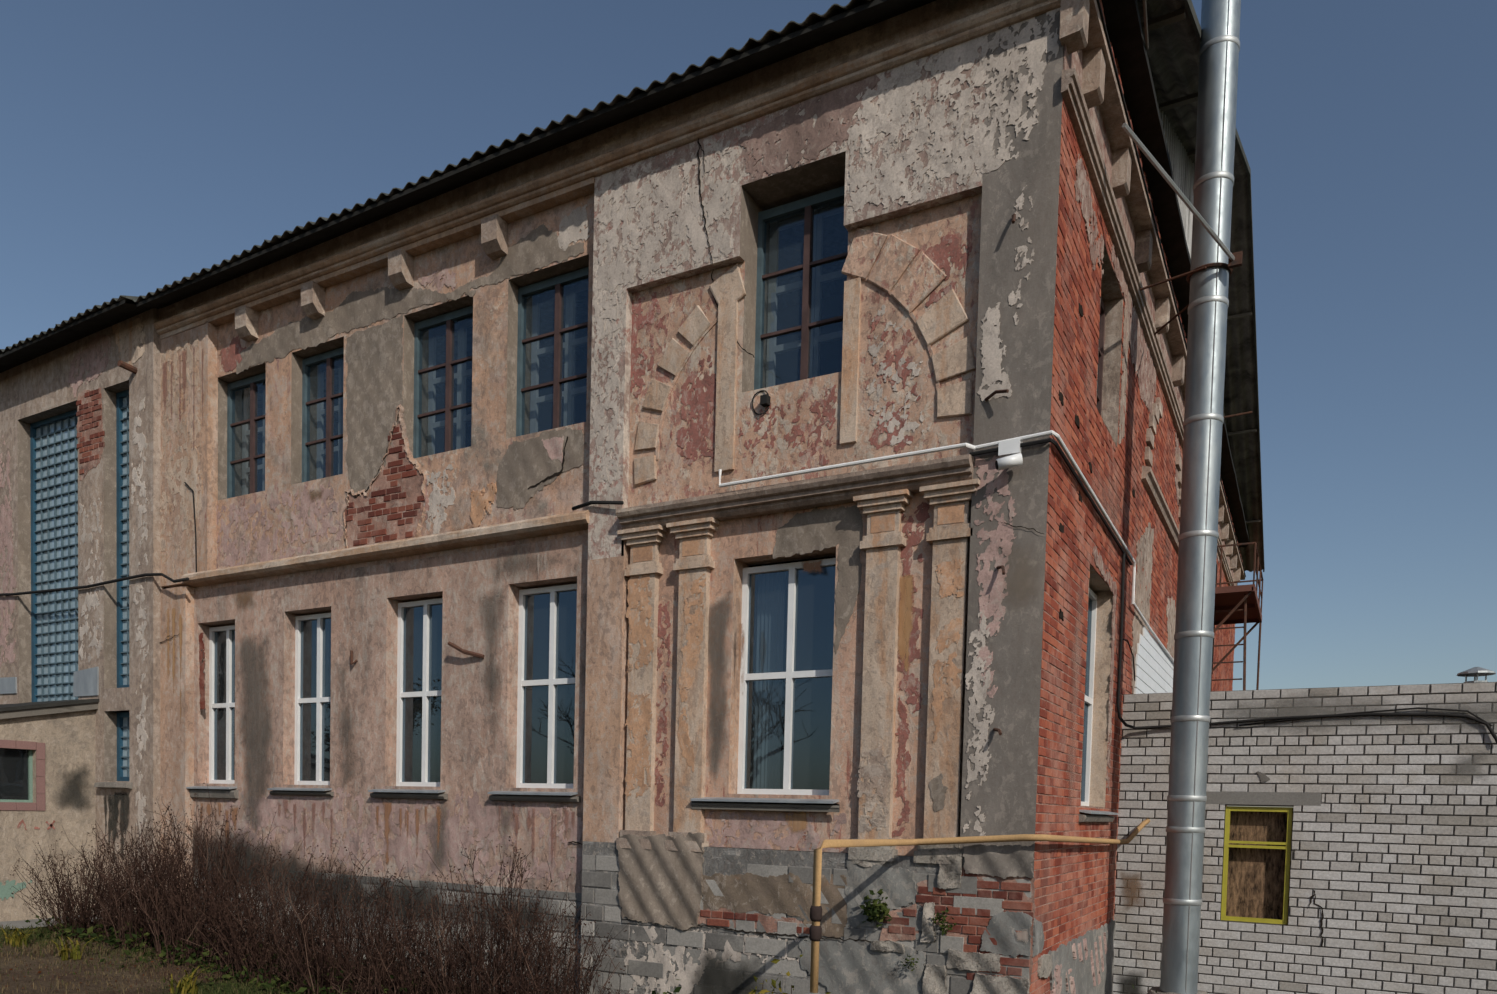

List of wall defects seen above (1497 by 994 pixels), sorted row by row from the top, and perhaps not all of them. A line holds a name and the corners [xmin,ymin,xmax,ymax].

peeling [68,317,203,833]
peeling [220,335,247,372]
flaking render [342,404,497,548]
peeling [557,7,1061,496]
flaking render [624,455,1116,994]
crack [1309,890,1324,947]